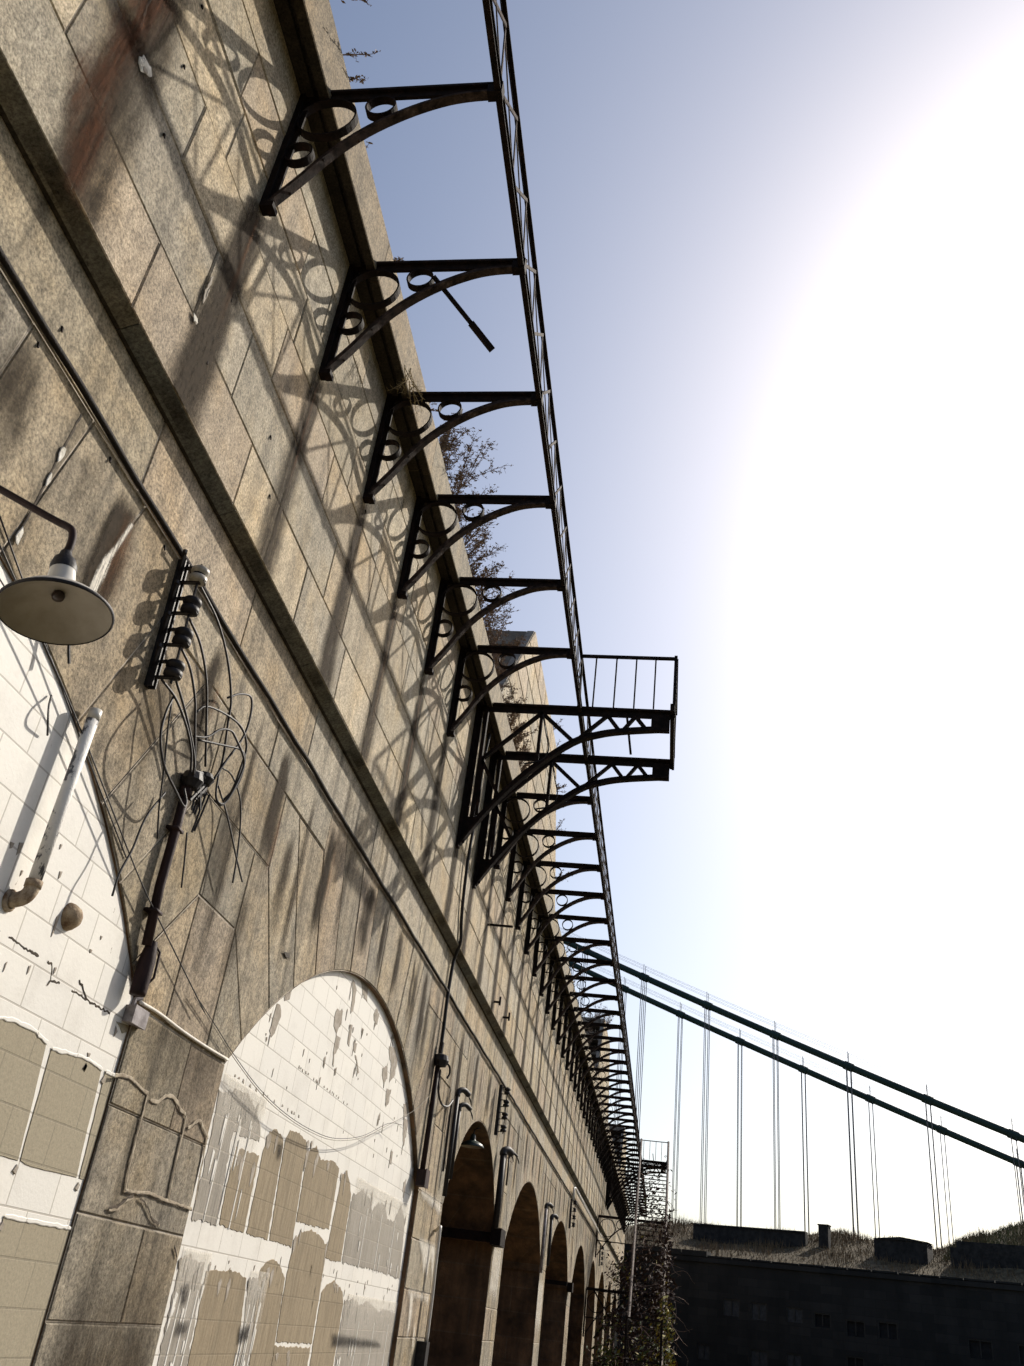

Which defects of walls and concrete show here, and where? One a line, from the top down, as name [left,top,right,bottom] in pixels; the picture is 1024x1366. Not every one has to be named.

peeling [0,1016,116,1191]
peeling [114,1021,129,1036]
peeling [265,990,292,1045]
peeling [298,980,379,1105]
peeling [157,1034,413,1366]
peeling [0,1214,72,1366]